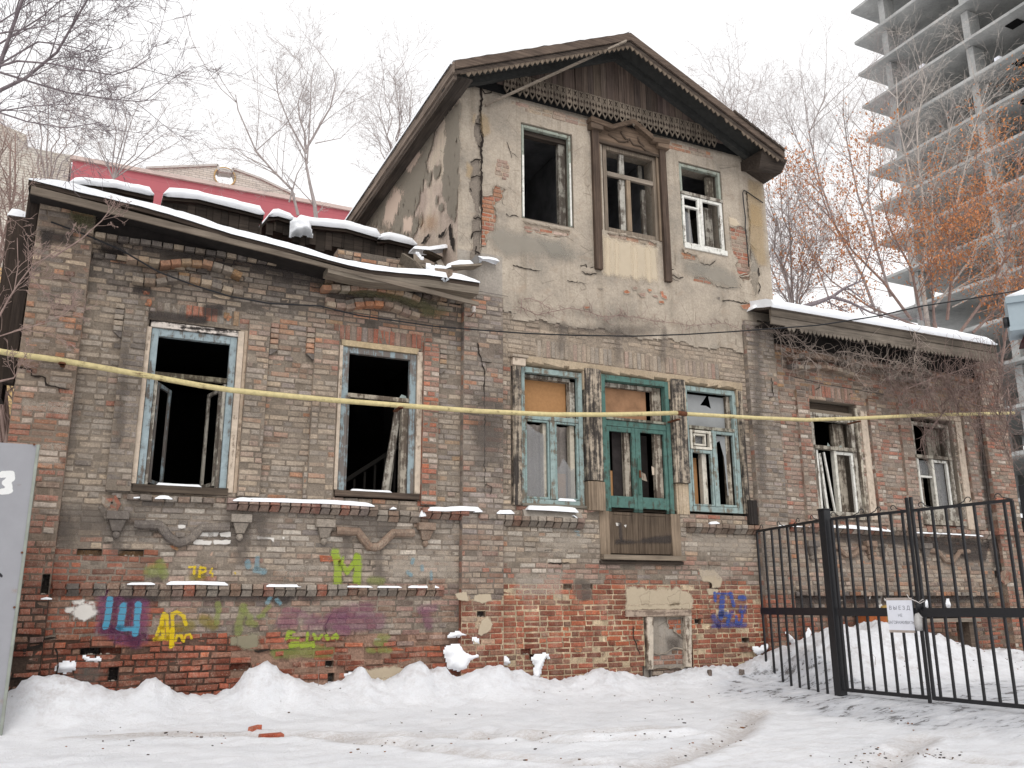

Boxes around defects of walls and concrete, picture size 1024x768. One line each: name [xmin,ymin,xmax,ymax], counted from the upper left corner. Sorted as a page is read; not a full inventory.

peeling [366,101,510,260]
crack [421,88,518,255]
spalling [729,217,761,310]
crack [477,343,492,494]